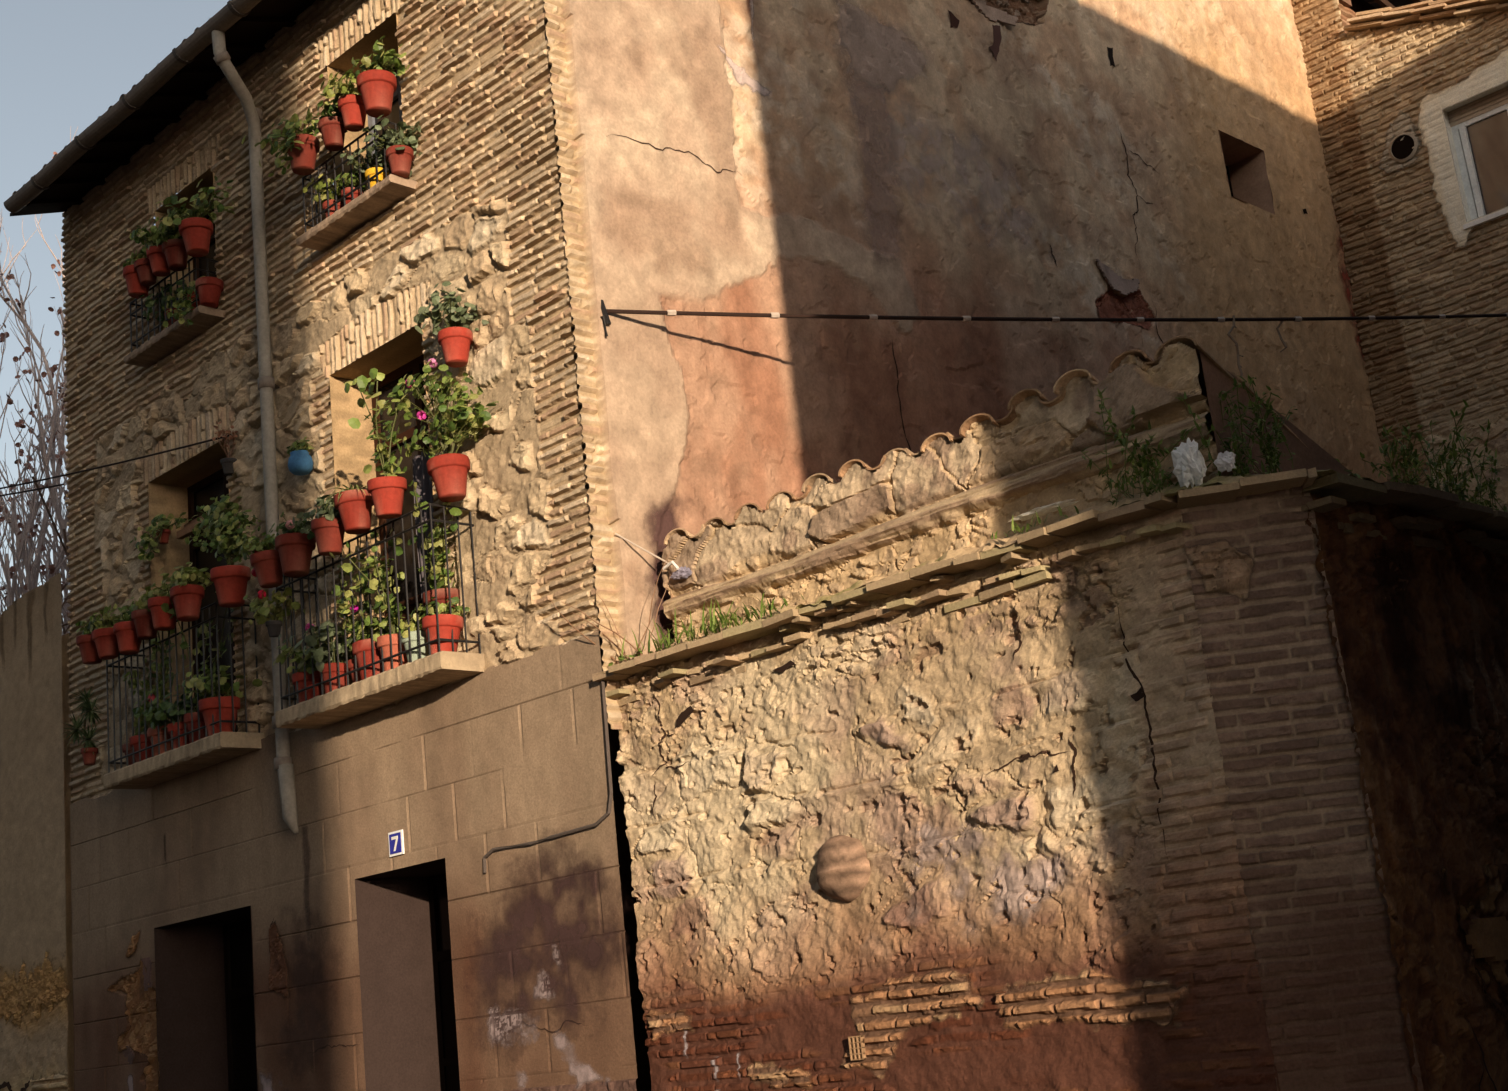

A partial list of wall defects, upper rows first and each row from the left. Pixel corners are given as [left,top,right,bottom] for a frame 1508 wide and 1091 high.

spalling [969,0,1049,61]
crack [608,134,735,173]
peeling [1095,259,1155,330]
spalling [0,951,70,1028]
leakage [479,854,620,1086]
spalling [841,967,1188,1077]